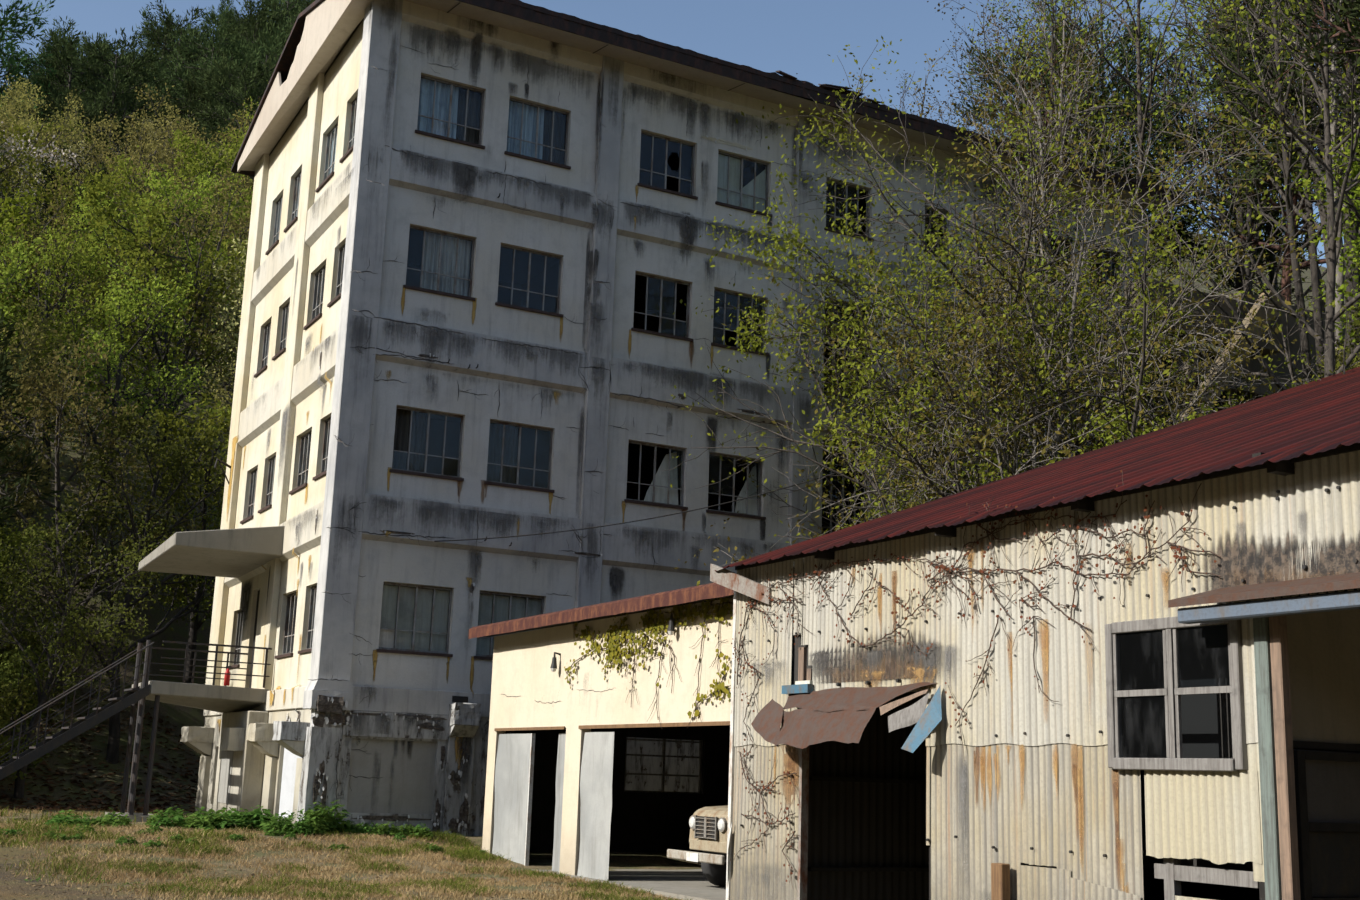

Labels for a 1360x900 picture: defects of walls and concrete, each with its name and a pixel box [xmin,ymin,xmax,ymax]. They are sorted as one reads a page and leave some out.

leakage [412,19,559,97]
leakage [583,74,603,123]
rust [877,571,897,640]
rust [968,540,983,610]
leakage [1204,525,1360,592]
leakage [811,631,955,683]
peeling [286,697,470,834]
rust [974,744,1025,800]
rust [1053,744,1084,847]
rust [1112,769,1127,892]